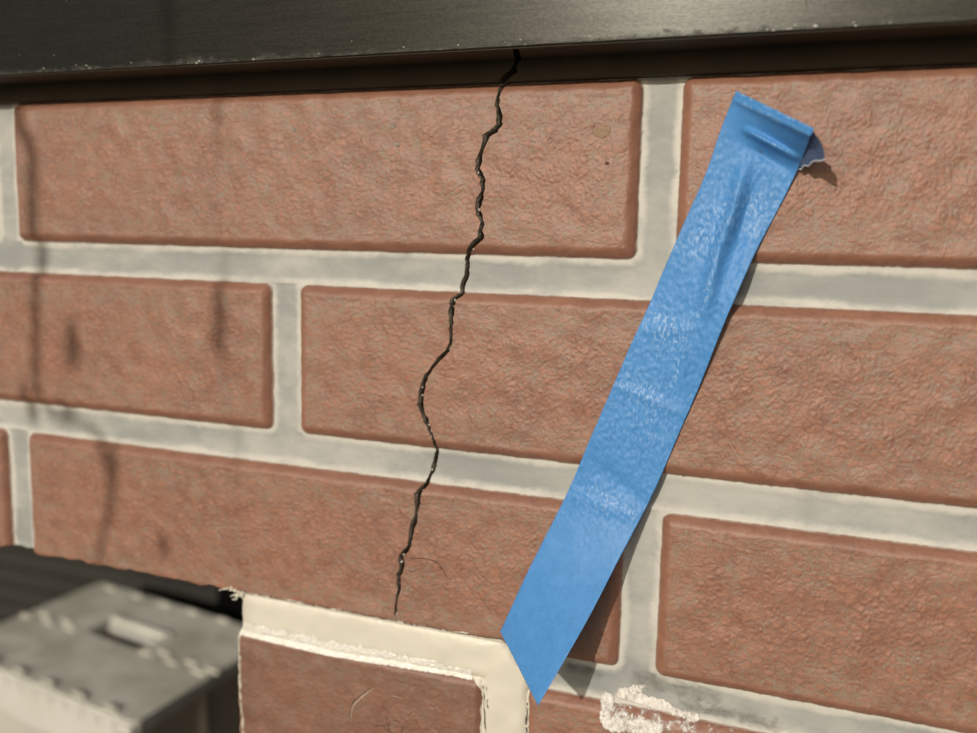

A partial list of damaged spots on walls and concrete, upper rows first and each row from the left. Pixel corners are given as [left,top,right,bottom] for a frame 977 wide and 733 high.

crack [236,49,521,640]